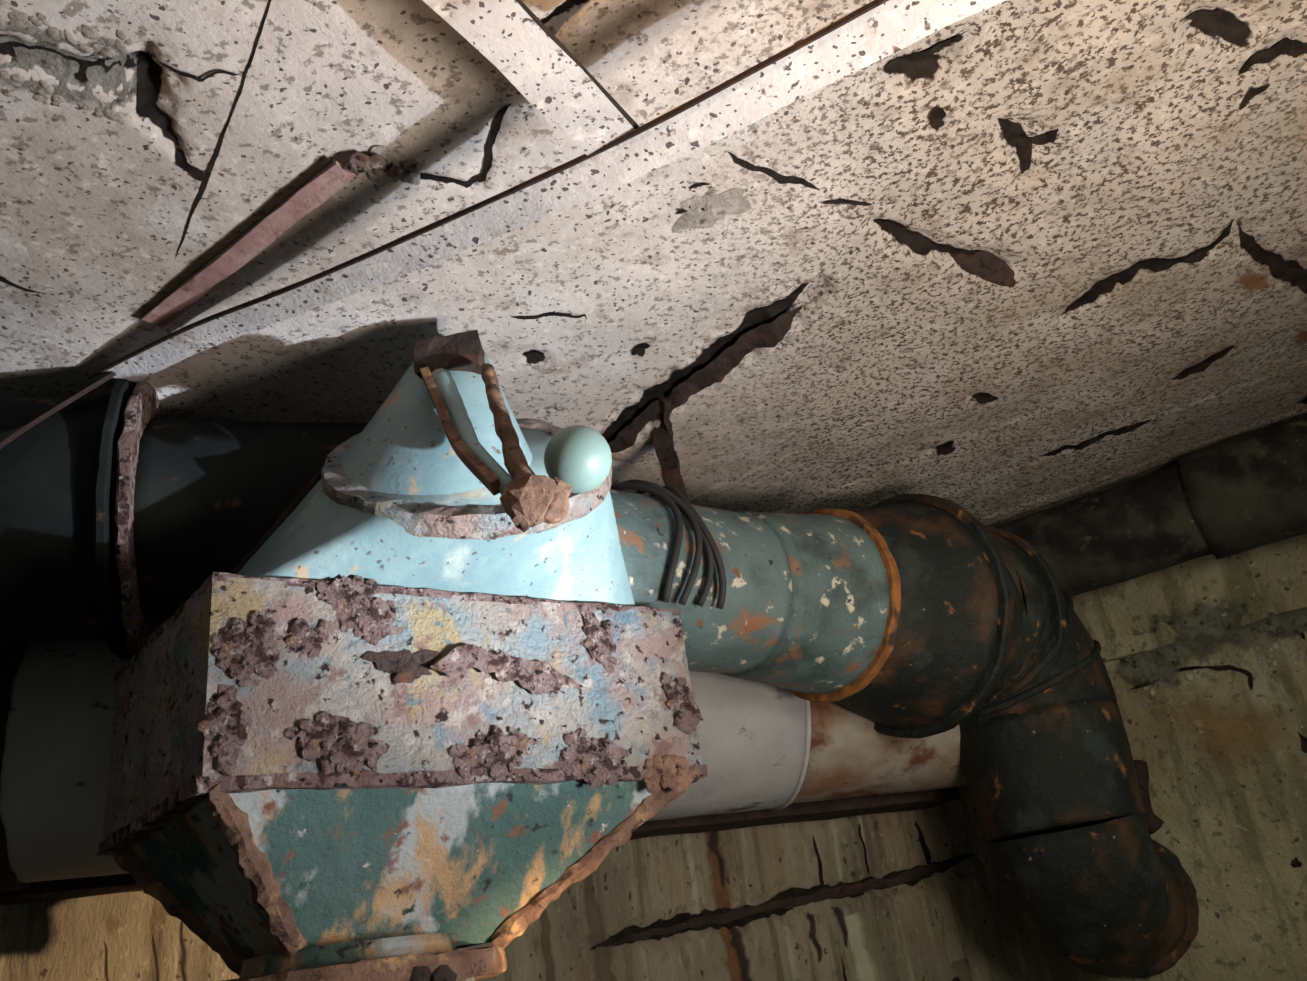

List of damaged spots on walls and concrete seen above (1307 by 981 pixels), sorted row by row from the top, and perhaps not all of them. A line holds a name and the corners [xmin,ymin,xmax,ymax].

spalling [523,0,590,24]
spalling [884,31,967,83]
crack [0,0,271,262]
spalling [929,106,946,131]
spalling [999,119,1058,174]
crack [0,276,46,294]
crack [1297,731,1307,753]
corrosion [706,831,730,911]
crack [813,835,824,884]
crack [858,823,869,876]
crack [914,819,931,864]
corrosion [721,927,744,981]